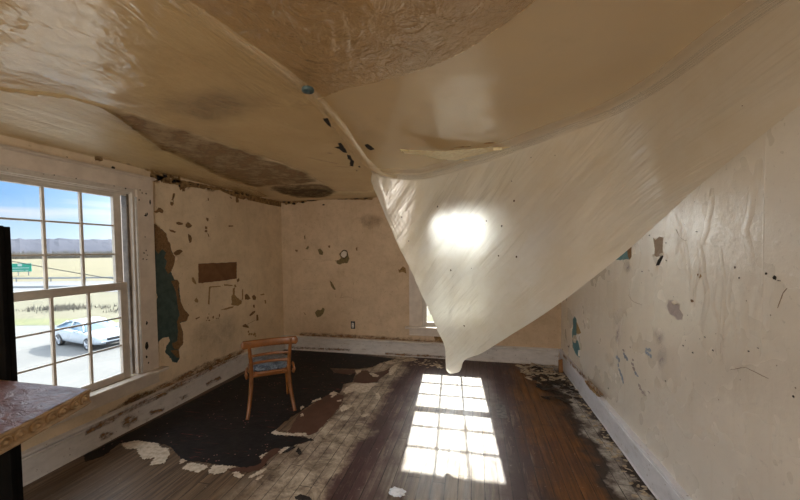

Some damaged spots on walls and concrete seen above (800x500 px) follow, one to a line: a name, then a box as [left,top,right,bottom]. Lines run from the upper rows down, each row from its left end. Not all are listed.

water stain [117,114,334,198]
peeling [139,168,374,363]
peeling [649,235,667,266]
peeling [667,300,683,320]
peeling [568,317,581,358]